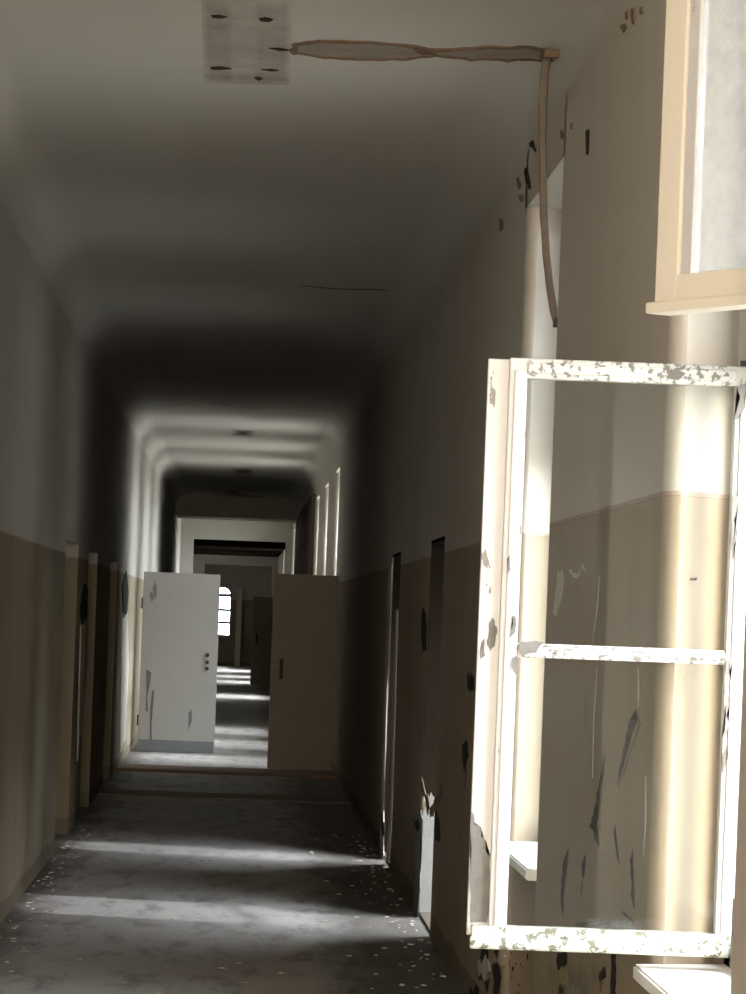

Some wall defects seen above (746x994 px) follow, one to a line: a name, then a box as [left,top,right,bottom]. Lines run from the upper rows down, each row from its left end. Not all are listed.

spalling [620,7,643,33]
peeling [516,167,531,203]
peeling [469,949,528,994]
spalling [556,952,568,994]